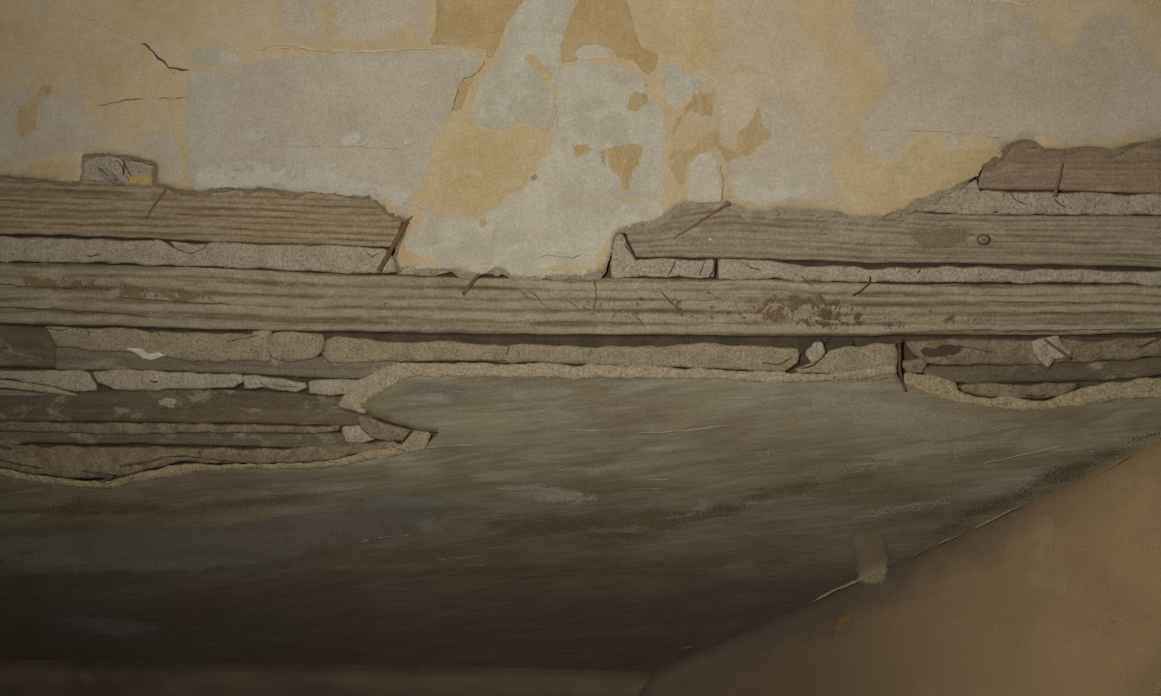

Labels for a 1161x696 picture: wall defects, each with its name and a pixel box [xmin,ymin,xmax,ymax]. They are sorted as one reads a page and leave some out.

crack [77,14,188,105]
peeling [430,0,658,132]
peeling [0,83,1161,281]
corrosion [569,291,913,331]
flaking render [0,379,77,396]
flaking render [338,362,1161,414]
flaking render [0,441,428,489]